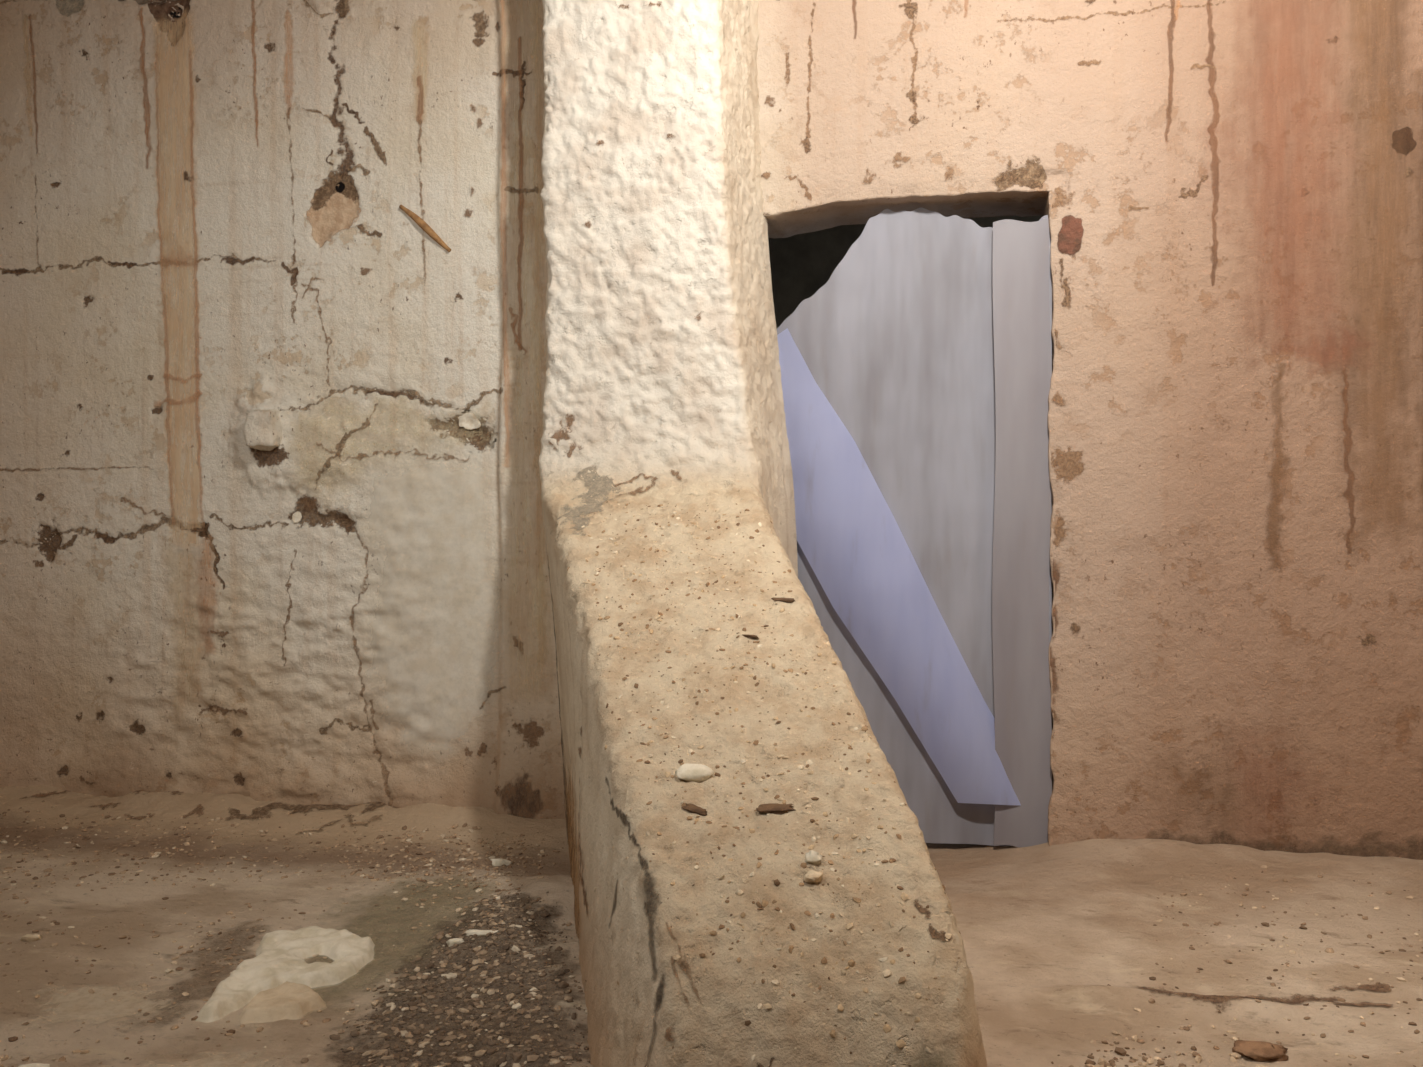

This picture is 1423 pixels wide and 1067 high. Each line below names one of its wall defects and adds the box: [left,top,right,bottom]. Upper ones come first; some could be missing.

flaking render [118,0,190,46]
crack [303,8,387,176]
peeling [473,11,500,47]
crack [0,466,297,666]
crack [0,253,501,489]
flaking render [307,171,382,248]
rust [511,37,527,353]
peeling [549,414,582,458]
peeling [558,466,682,535]
leakage [1343,0,1408,552]
crack [227,531,394,834]
crack [605,778,699,1067]